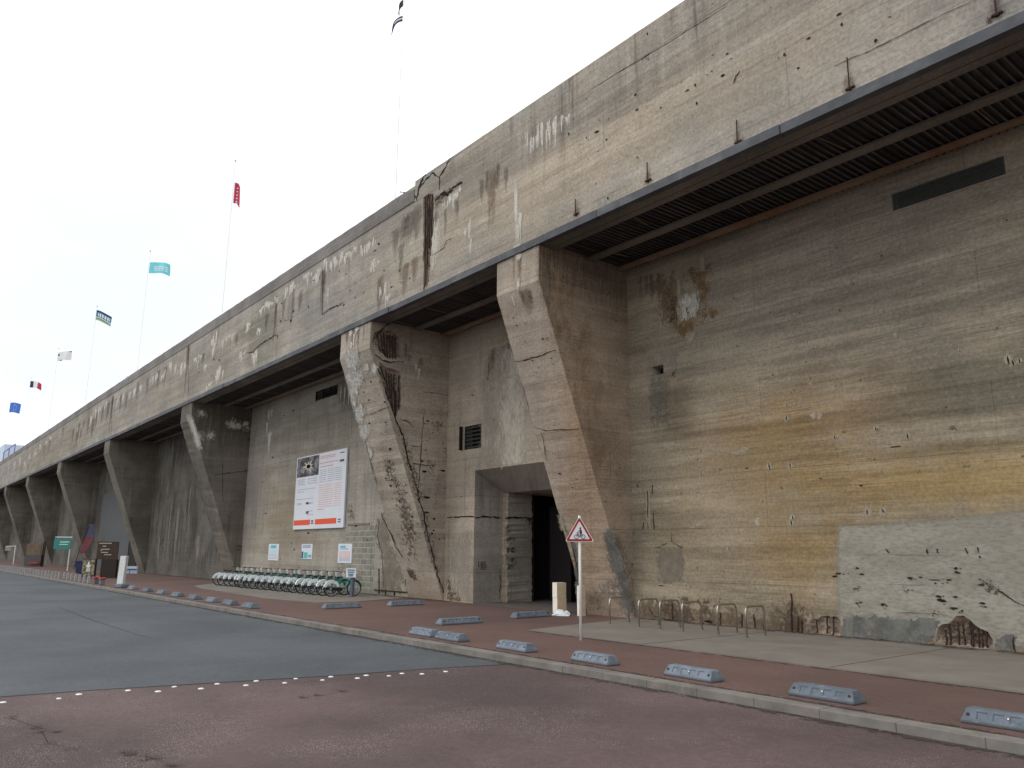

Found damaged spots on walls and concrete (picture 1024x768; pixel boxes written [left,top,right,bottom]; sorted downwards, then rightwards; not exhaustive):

water stain [525,113,570,157]
crack [396,159,462,213]
water stain [258,237,379,315]
spalling [654,255,718,342]
peeling [340,323,445,596]
crack [369,368,533,593]
spalling [932,567,995,649]